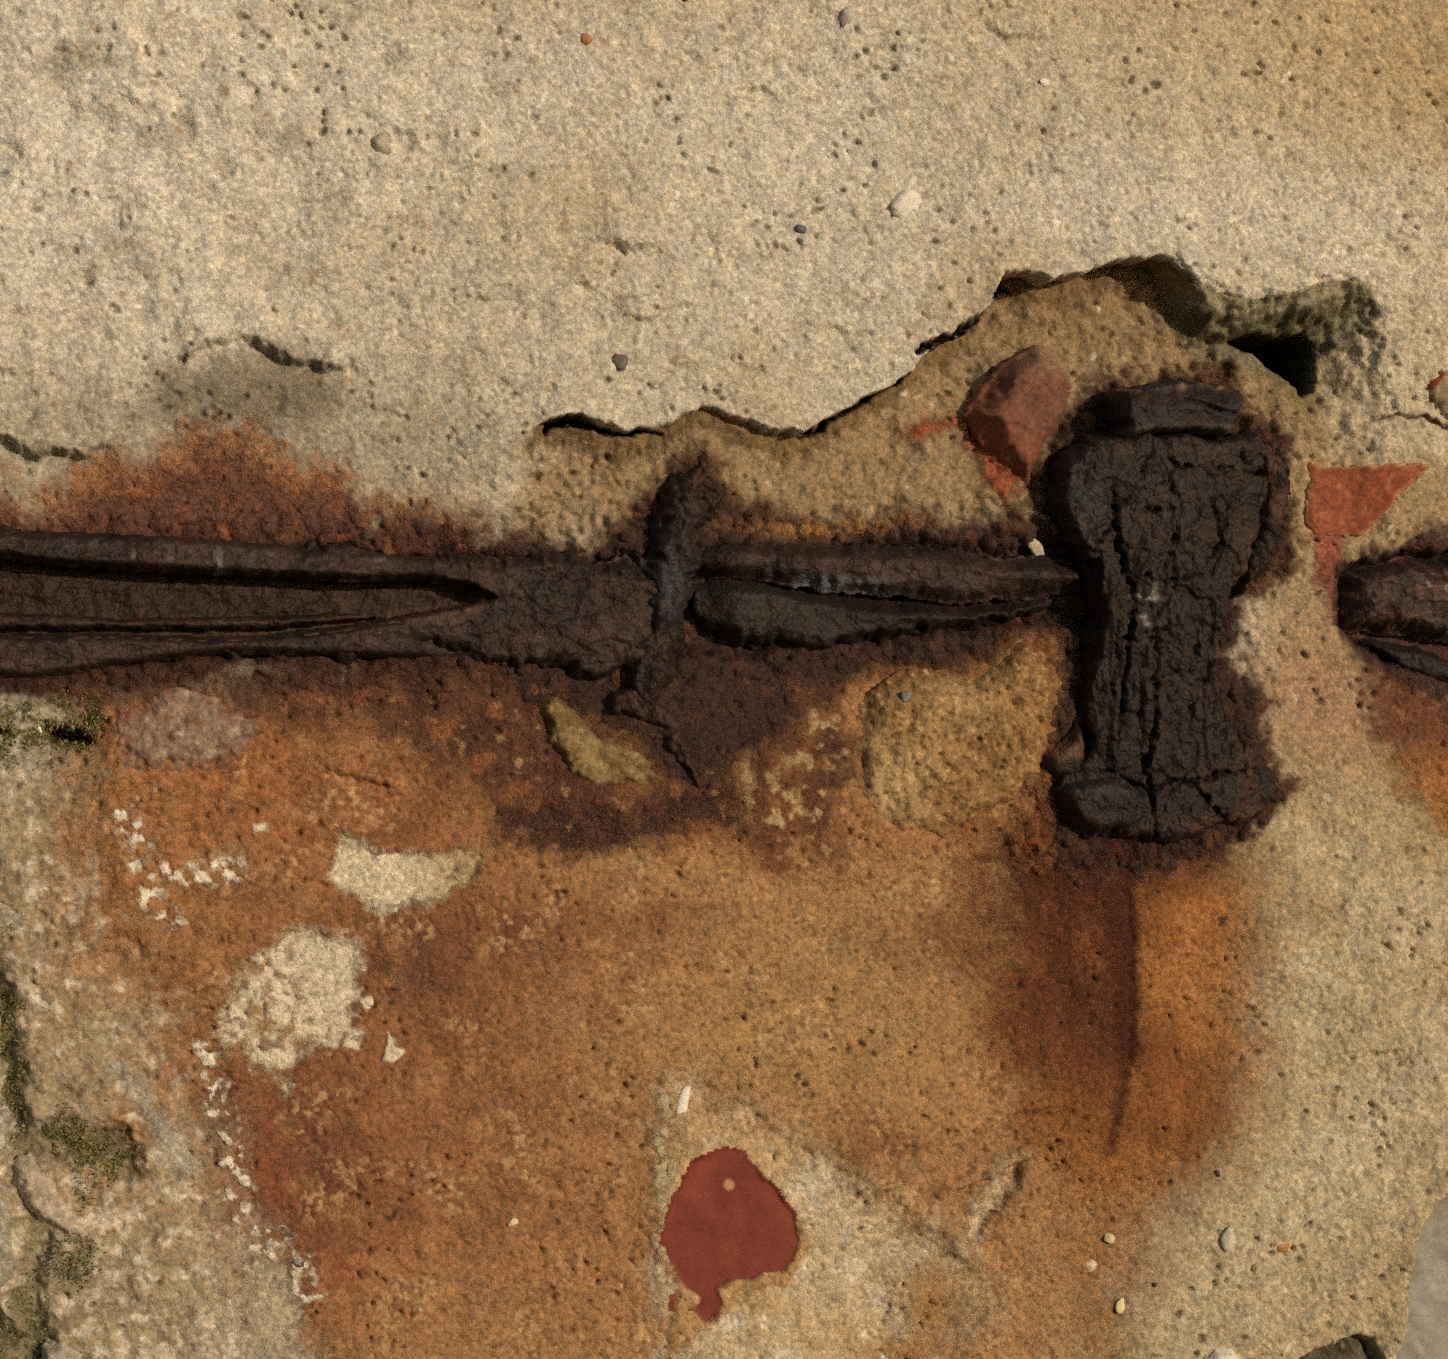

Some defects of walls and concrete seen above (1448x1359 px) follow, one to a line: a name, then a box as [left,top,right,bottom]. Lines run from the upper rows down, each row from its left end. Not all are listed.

spalling [992,259,1375,371]
spalling [528,324,977,462]
peeling [1028,539,1045,557]
peeling [1231,445,1291,597]
rust [1324,525,1448,833]
rust [10,497,1304,1359]
peeling [639,1064,1024,1359]